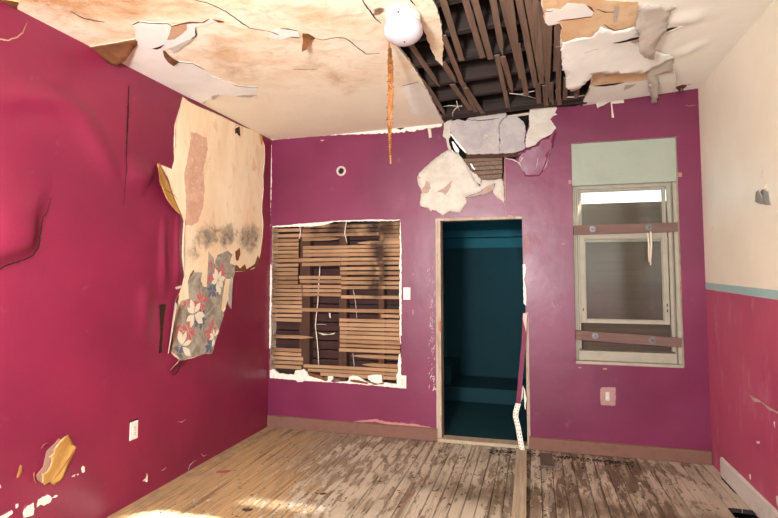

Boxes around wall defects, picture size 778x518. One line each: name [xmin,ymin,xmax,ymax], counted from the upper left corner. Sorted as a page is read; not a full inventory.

crack [196,0,270,32]
peeling [270,28,315,52]
flaking render [542,0,639,42]
peeling [584,58,674,108]
spalling [321,82,557,182]
flaking render [90,18,265,320]
hole [755,183,771,206]
crack [0,199,52,271]
flaking render [269,219,402,388]
peeling [0,494,58,518]